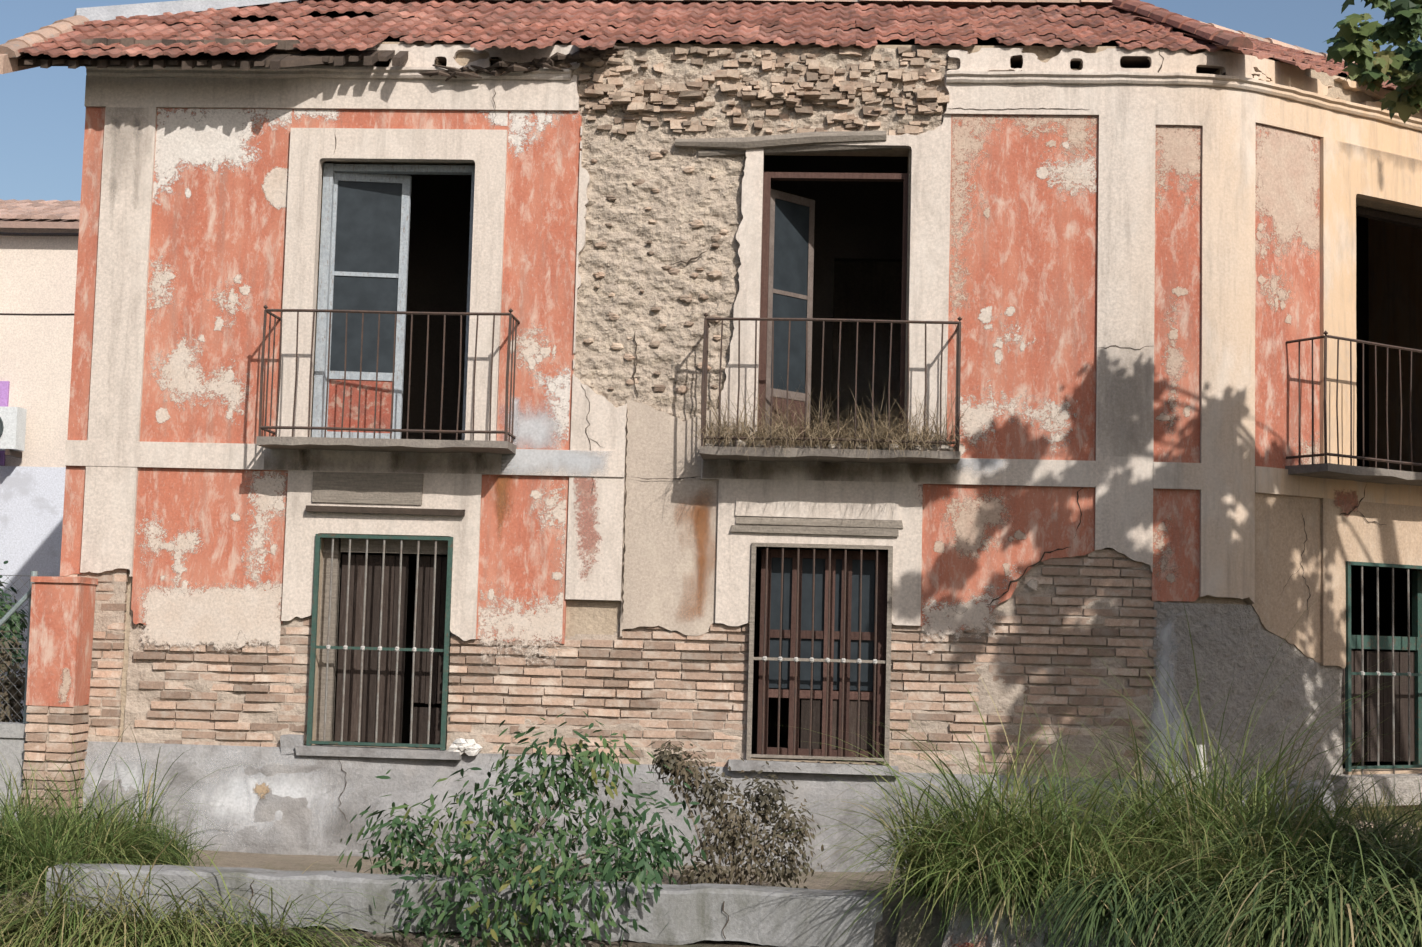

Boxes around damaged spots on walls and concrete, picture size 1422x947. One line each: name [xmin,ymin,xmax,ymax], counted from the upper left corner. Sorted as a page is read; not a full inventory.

peeling [152,108,339,205]
peeling [148,256,176,326]
peeling [147,274,252,425]
spalling [478,44,1097,456]
peeling [934,488,1027,559]
crack [986,488,1083,605]
flaking render [446,484,750,767]
flaking render [889,517,1178,780]